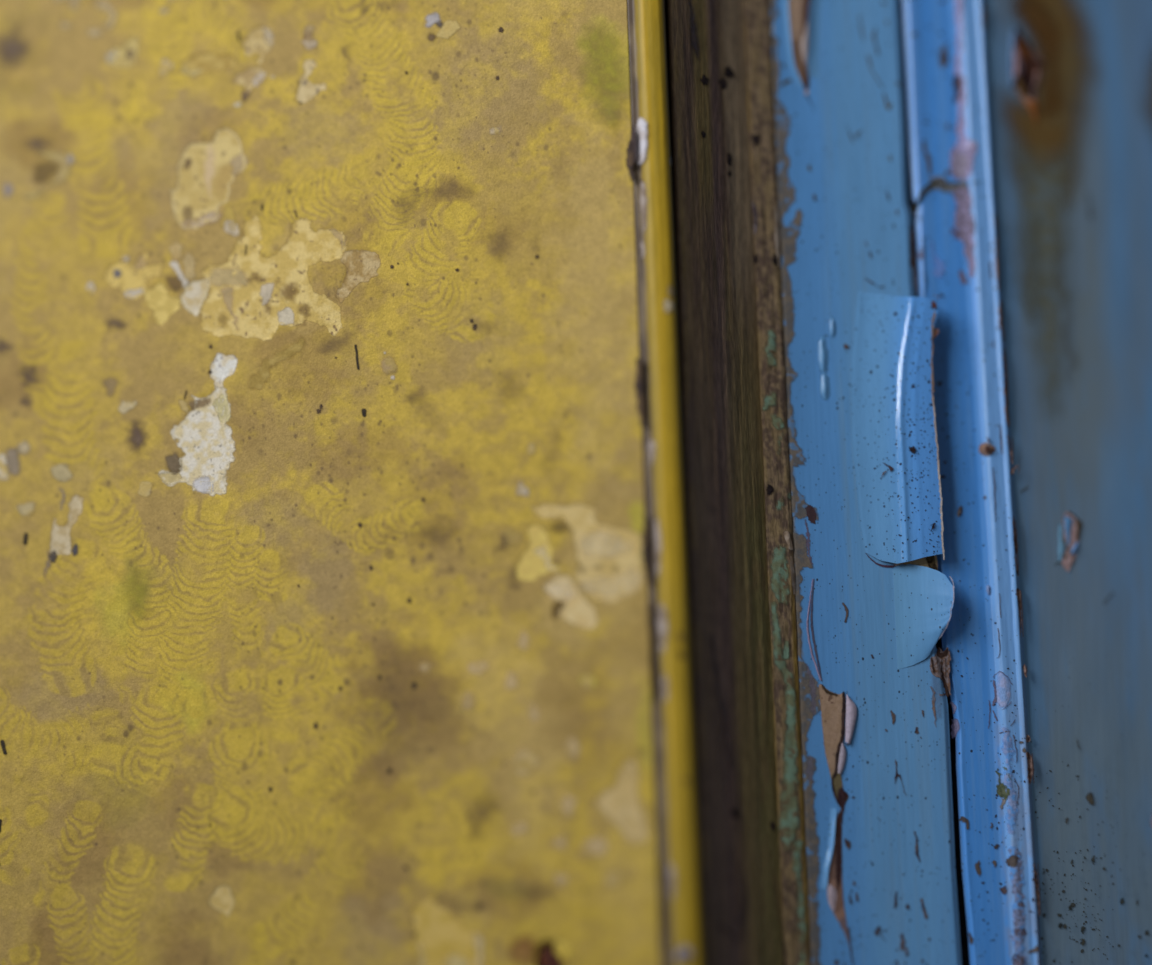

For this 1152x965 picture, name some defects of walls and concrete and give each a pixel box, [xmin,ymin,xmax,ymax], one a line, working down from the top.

peeling [86,128,380,389]
crack [899,0,983,297]
peeling [950,0,978,284]
corrosion [1006,0,1087,384]
peeling [104,378,137,414]
peeling [138,353,237,497]
peeling [516,483,662,629]
peeling [770,0,857,965]
peeling [1055,512,1082,572]
crack [947,697,968,965]